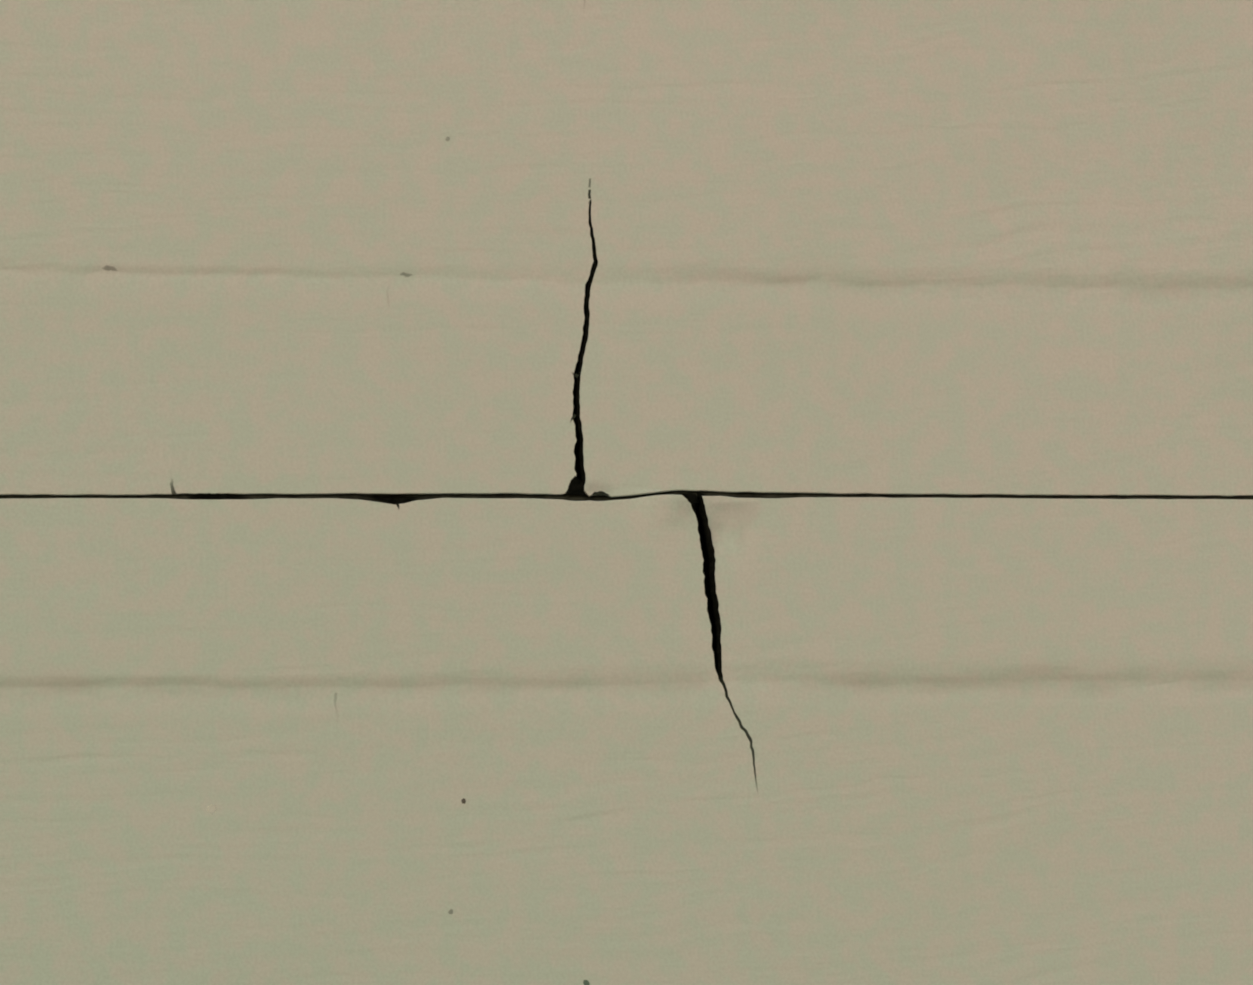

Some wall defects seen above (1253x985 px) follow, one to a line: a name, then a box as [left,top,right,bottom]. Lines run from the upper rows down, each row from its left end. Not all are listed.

crack [564,189,609,497]
crack [681,491,756,775]